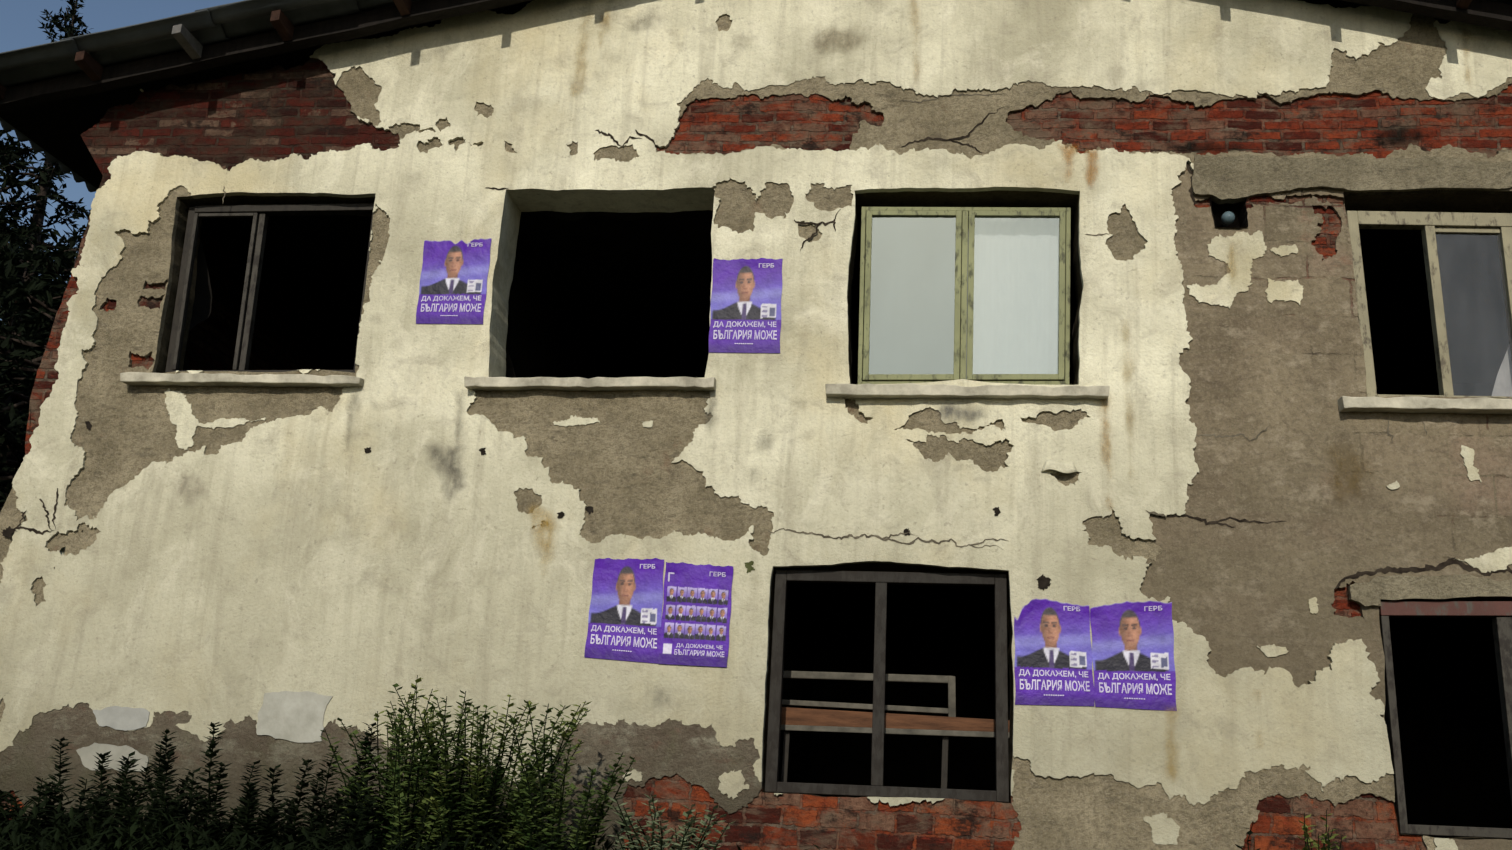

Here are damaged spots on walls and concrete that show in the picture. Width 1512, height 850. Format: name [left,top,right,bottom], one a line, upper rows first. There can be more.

spalling [81,58,483,188]
spalling [568,142,639,162]
crack [901,93,1003,153]
spalling [359,204,390,333]
spalling [25,186,359,556]
spalling [655,14,1512,720]
spalling [0,487,28,583]
spalling [467,390,774,573]
crack [768,528,1008,549]
crack [1146,510,1281,528]
crack [1336,558,1512,589]
spalling [0,702,1512,850]